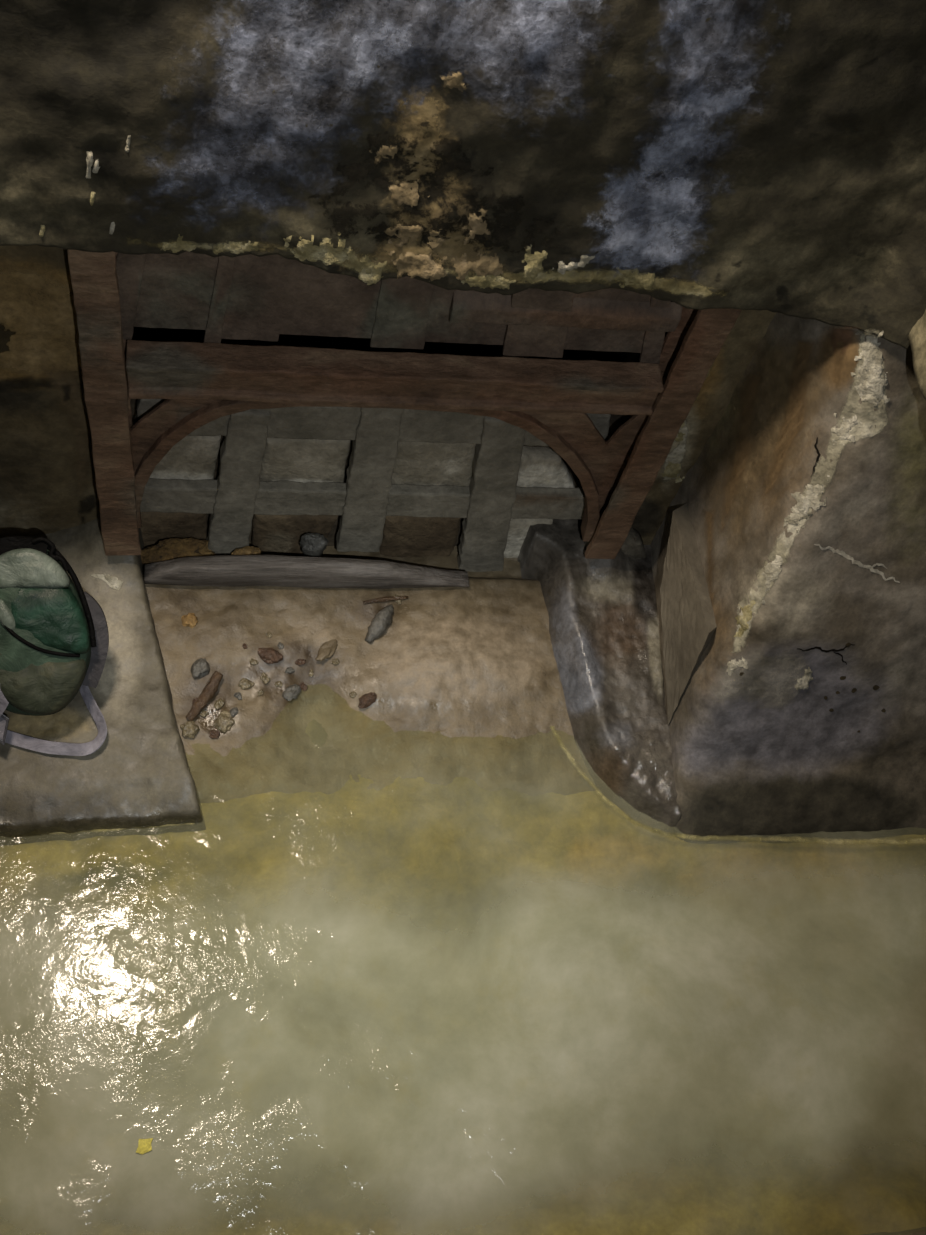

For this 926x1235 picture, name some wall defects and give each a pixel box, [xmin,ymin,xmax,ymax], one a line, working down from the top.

peeling [128,71,727,298]
damp [154,0,763,275]
crack [797,644,853,665]